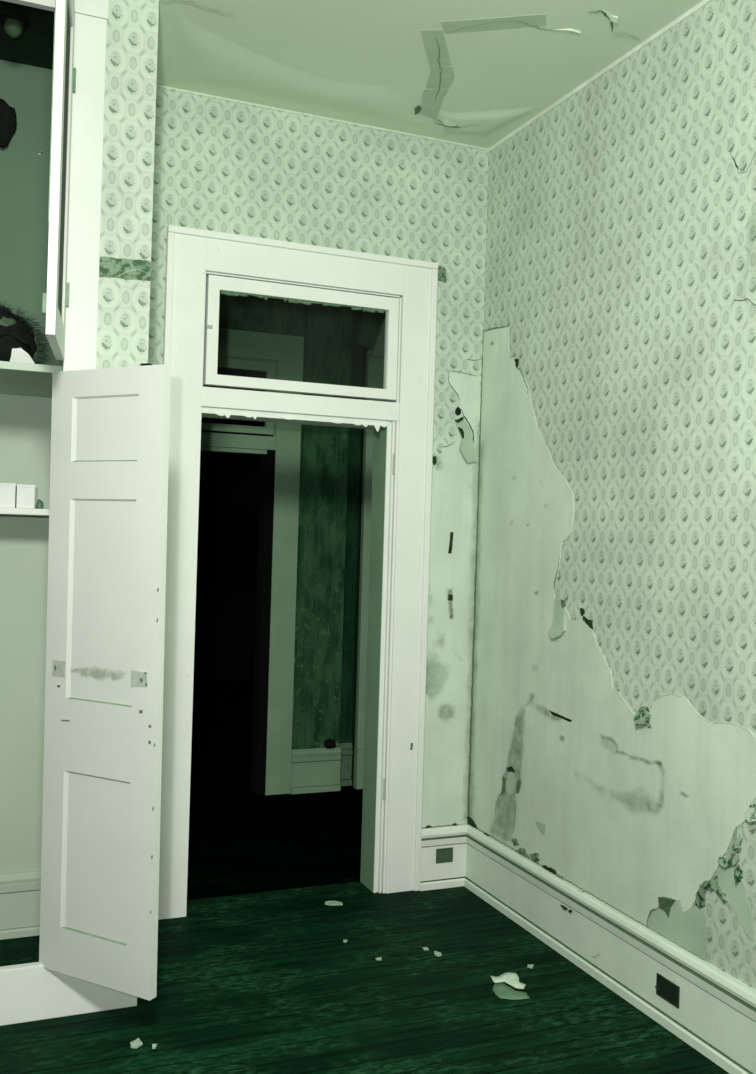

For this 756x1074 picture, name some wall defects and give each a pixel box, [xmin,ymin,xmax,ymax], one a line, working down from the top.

crack [435,11,641,99]
peeling [548,598,566,639]
peeling [633,706,651,725]
leakage [495,766,522,839]
peeling [695,824,754,941]